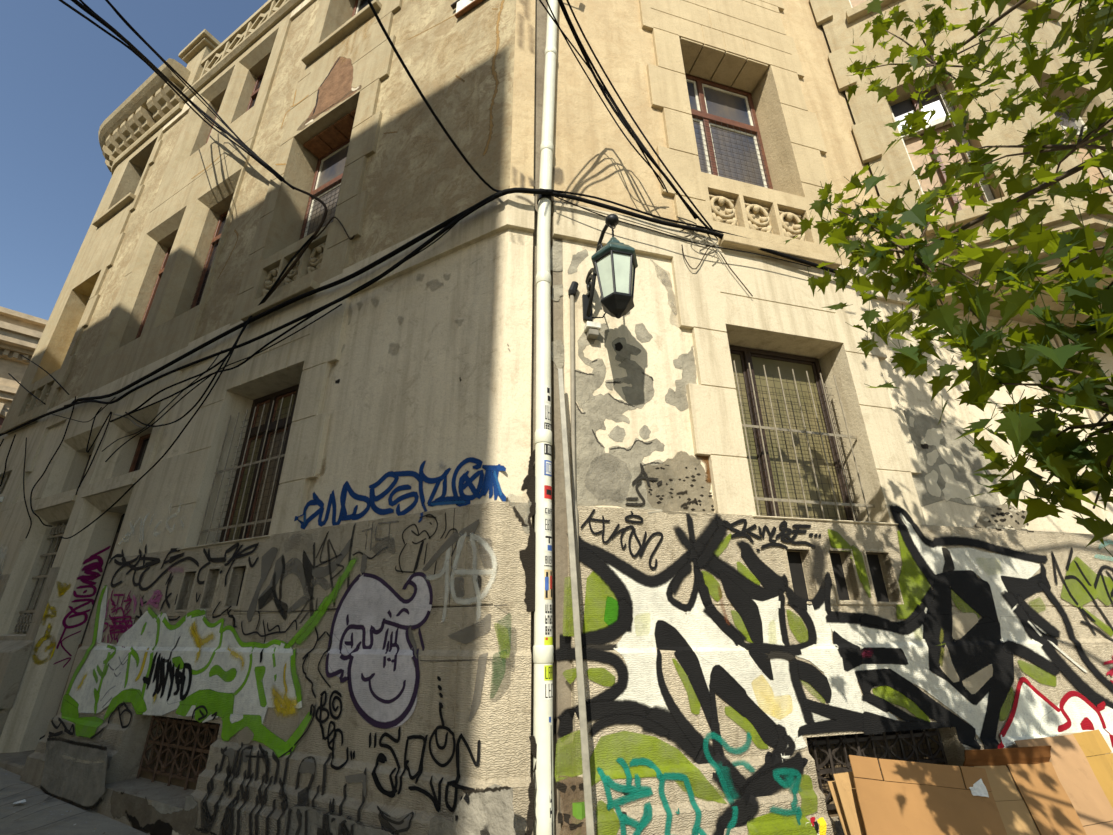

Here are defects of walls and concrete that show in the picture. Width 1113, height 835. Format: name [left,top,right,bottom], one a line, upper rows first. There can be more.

flaking render [297,56,361,159]
peeling [550,241,588,301]
peeling [551,323,715,516]